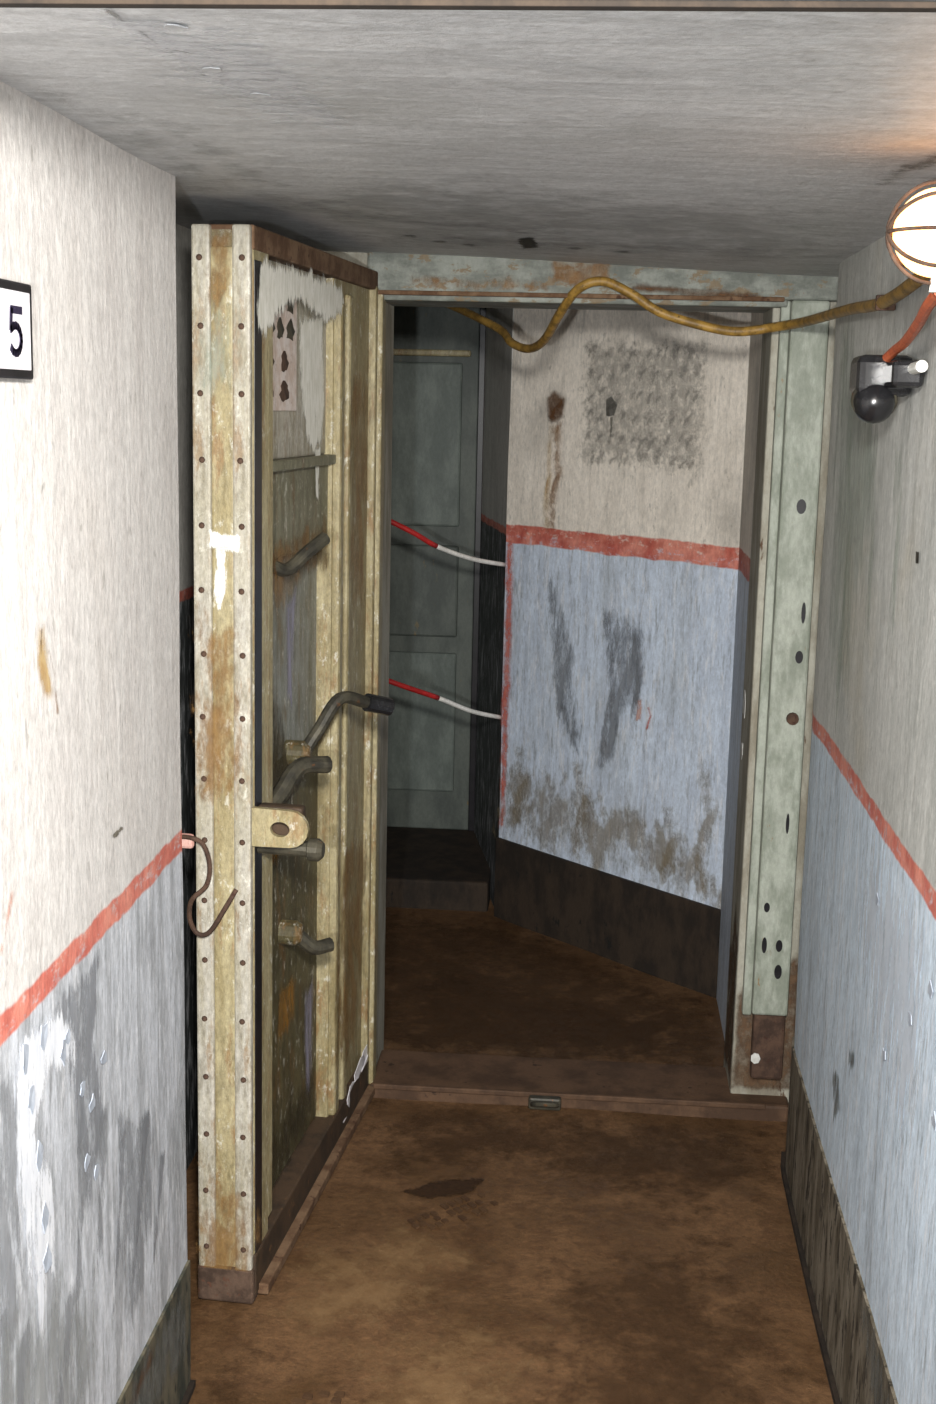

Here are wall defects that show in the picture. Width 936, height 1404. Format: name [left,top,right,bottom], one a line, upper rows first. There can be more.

rust [546,393,564,527]
rust [201,630,238,796]
water stain [550,583,578,750]
water stain [600,614,651,760]
water stain [116,1113,165,1321]
water stain [2,1290,94,1404]